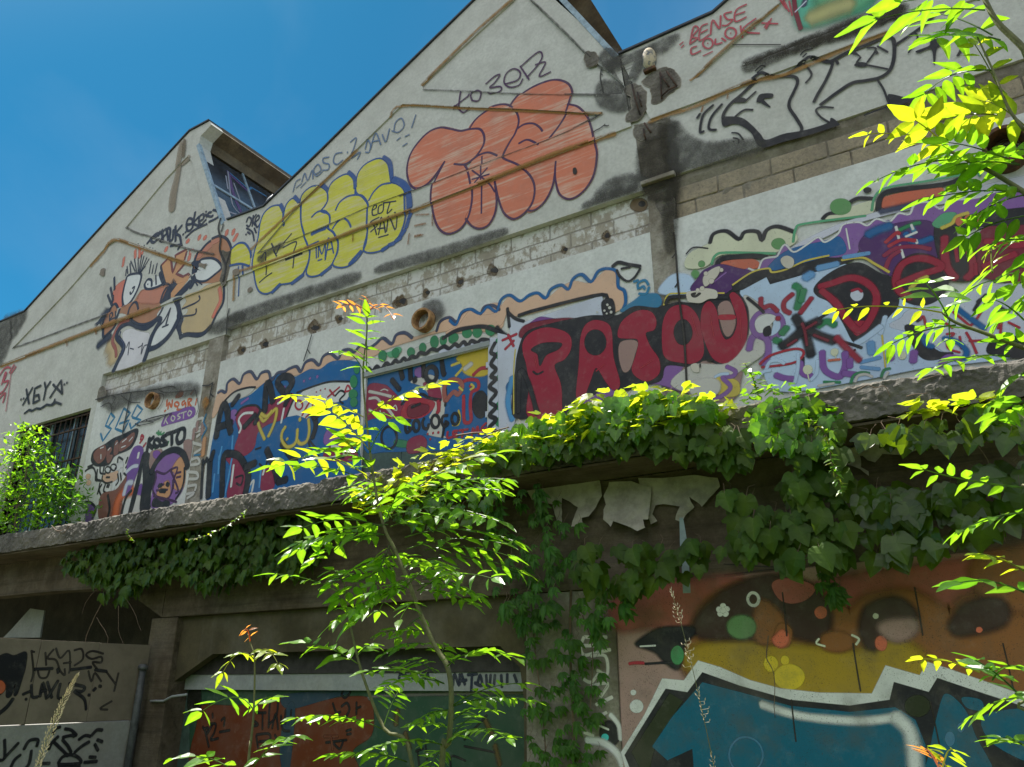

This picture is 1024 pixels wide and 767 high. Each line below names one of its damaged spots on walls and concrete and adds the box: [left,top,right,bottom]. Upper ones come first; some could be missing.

damp [257,0,679,262]
damp [581,118,765,253]
damp [374,228,508,273]
damp [207,272,361,334]
peeling [527,475,720,533]